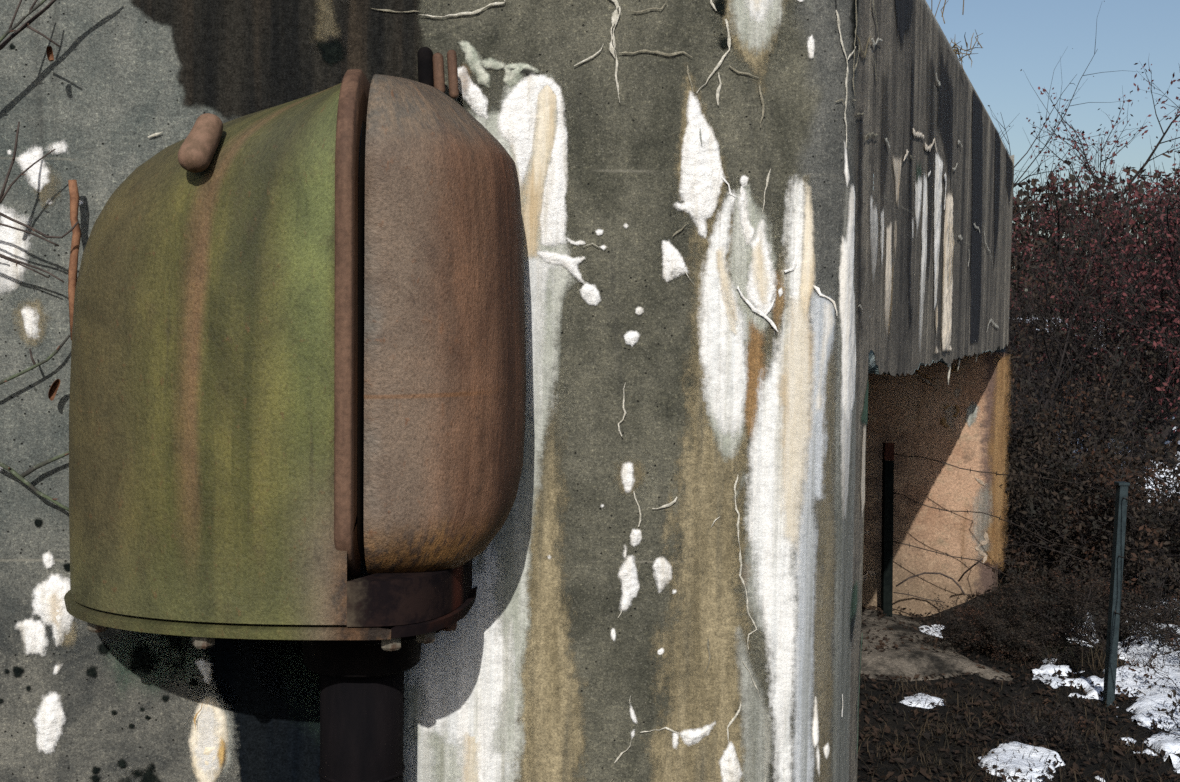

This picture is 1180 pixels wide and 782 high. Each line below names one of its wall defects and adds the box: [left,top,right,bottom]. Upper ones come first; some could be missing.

damp [132,0,421,119]
crack [371,0,505,18]
crack [574,0,759,105]
damp [403,74,585,782]
damp [650,52,954,782]
peeling [17,563,73,655]
peeling [619,529,642,610]
peeling [35,693,65,753]
peeling [189,659,233,782]
damp [205,639,320,782]
crack [610,696,677,782]
crack [727,703,741,743]